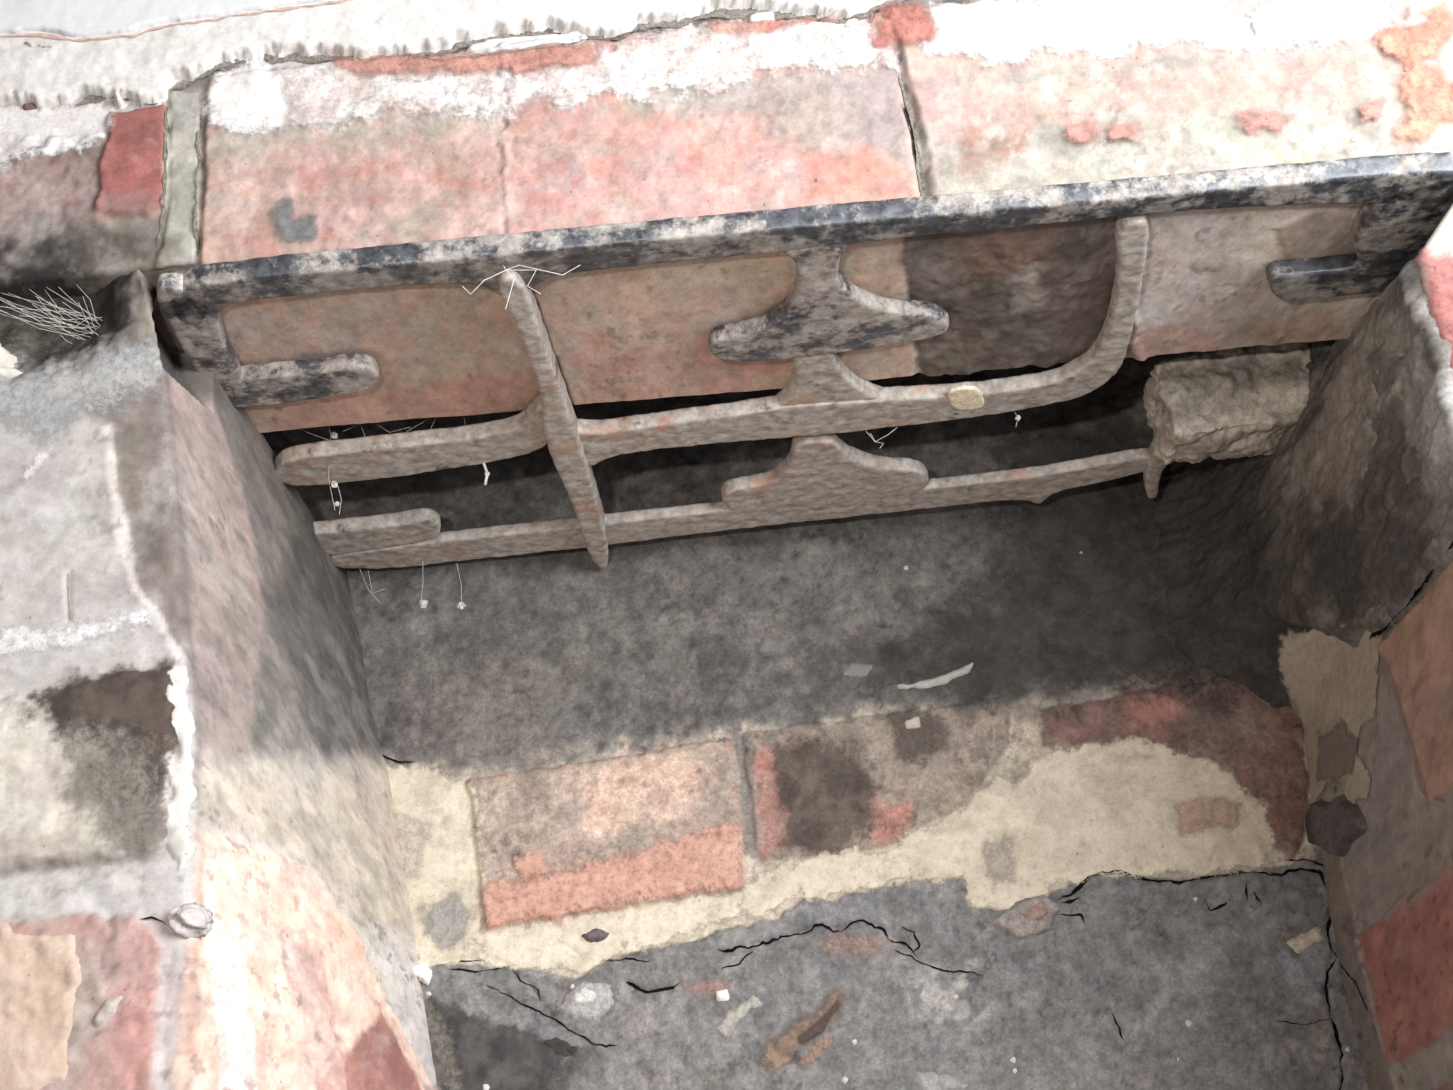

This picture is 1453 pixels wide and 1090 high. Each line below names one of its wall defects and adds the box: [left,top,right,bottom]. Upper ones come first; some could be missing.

peeling [0,344,23,378]
damp [57,719,168,859]
crack [452,959,618,1048]
crack [580,956,680,993]
crack [718,919,983,976]
crack [1059,859,1368,1090]